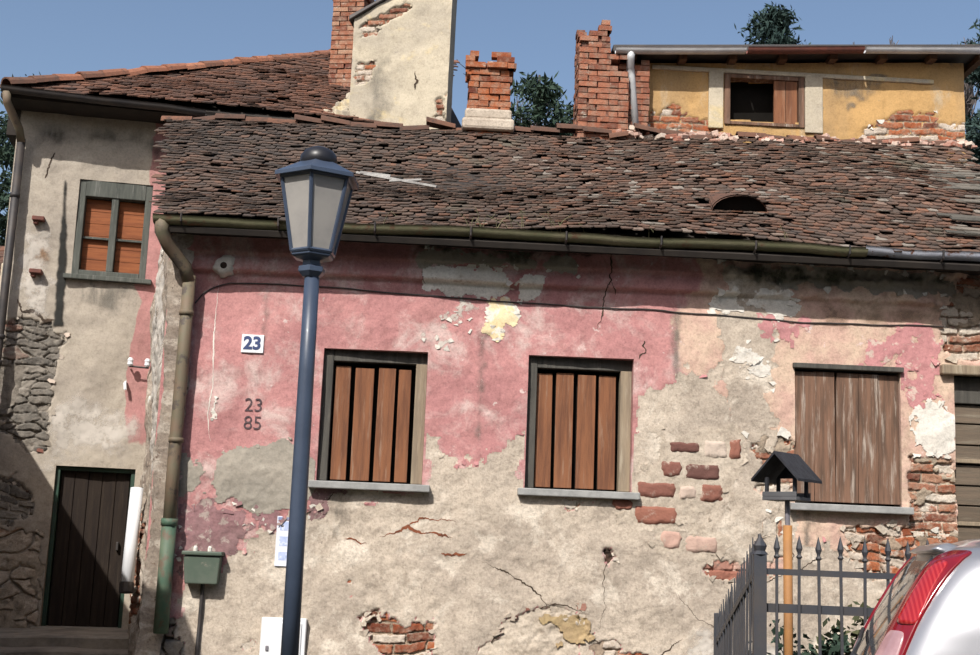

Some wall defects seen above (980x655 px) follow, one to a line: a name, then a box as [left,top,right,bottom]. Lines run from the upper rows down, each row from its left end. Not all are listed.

flaking render [359,3,412,37]
peeling [863,110,965,141]
flaking render [0,233,71,453]
peeling [148,247,164,487]
crack [597,254,616,329]
peeling [301,245,980,655]
flaking render [0,472,45,628]
flaking render [127,507,146,634]
peeling [159,505,290,655]
crack [346,517,618,655]